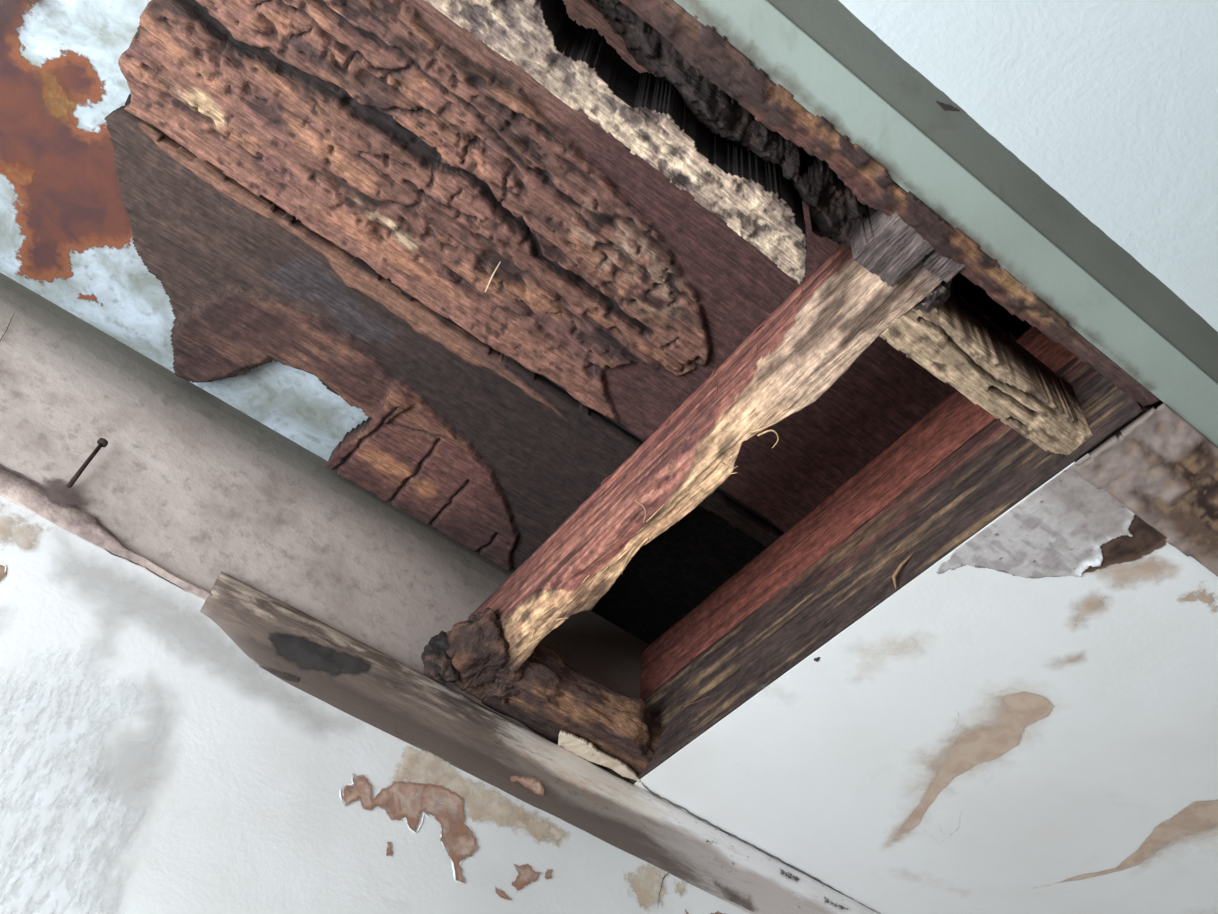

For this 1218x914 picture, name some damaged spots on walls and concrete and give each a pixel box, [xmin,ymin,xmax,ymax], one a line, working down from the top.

rust [0,0,133,283]
peeling [936,453,1135,579]
damp [1101,558,1168,583]
damp [1179,590,1217,611]
damp [269,632,370,675]
peeling [510,776,544,795]
peeling [557,730,641,782]
damp [894,692,1053,839]
peeling [339,773,479,884]
damp [1062,800,1218,882]
peeling [496,864,553,900]